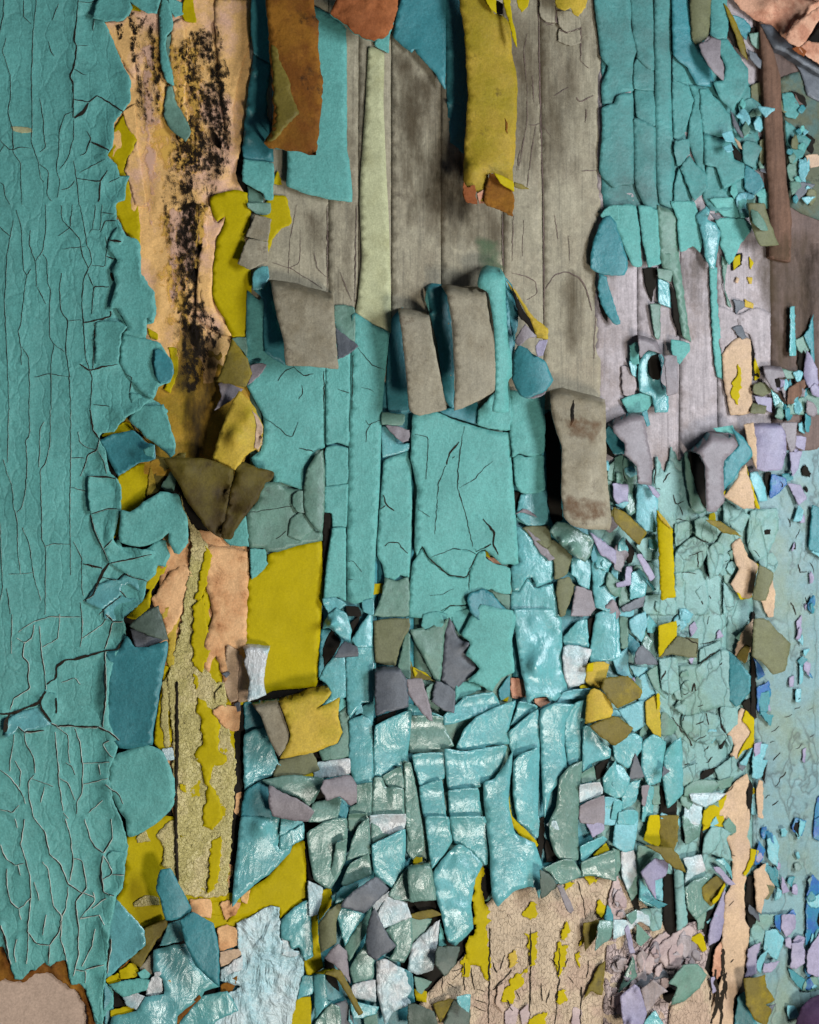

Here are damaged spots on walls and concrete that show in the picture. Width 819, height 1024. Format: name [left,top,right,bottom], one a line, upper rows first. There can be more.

crack [0,0,152,983]
water stain [116,12,232,457]
peeling [0,0,357,1024]
crack [278,349,378,401]
crack [381,426,498,611]
peeling [374,0,529,216]
peeling [297,305,819,1024]
peeling [539,0,587,46]
peeling [590,0,819,434]